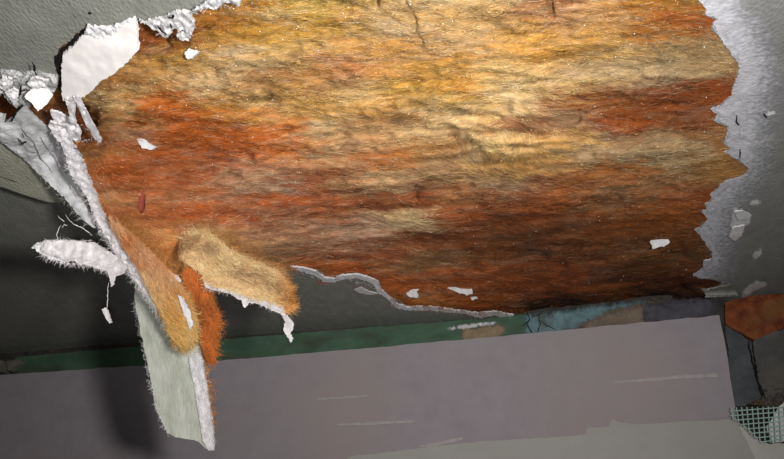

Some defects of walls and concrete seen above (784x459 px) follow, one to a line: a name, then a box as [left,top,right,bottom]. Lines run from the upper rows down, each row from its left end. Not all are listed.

flaking render [185,48,199,60]
flaking render [0,16,140,144]
flaking render [137,139,158,150]
peeling [728,200,761,241]
flaking render [649,239,670,249]
peeling [354,287,378,295]
flaking render [448,287,478,300]
peeling [742,281,767,297]
flaking render [449,322,505,339]
crack [749,343,763,396]